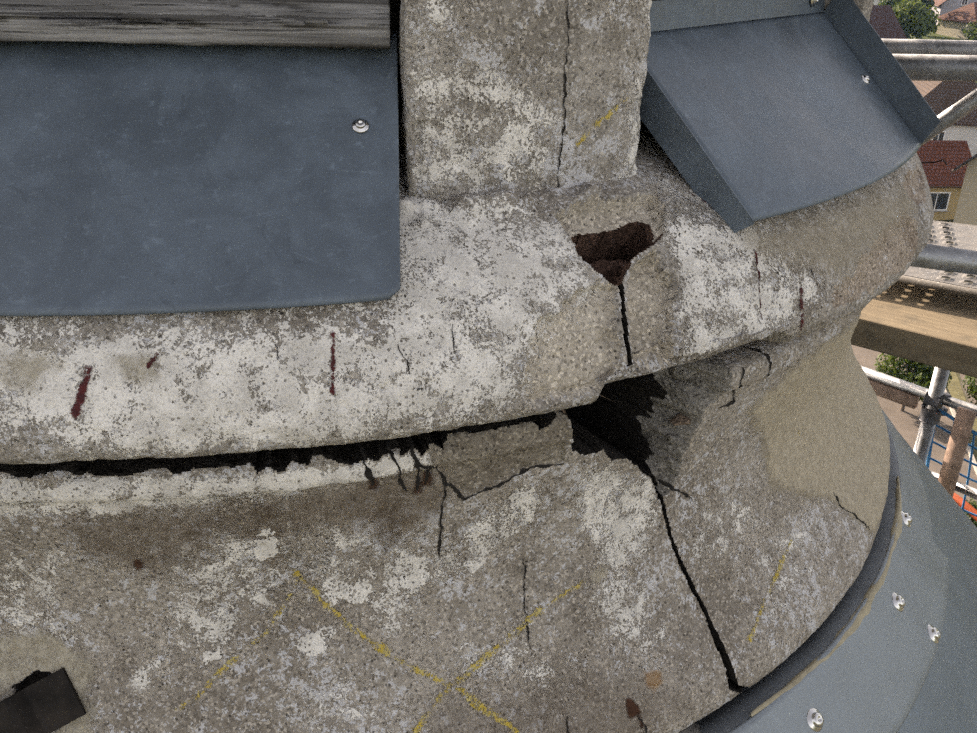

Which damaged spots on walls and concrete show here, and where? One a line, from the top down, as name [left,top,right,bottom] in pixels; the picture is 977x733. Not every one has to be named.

crack [557,0,570,187]
peeling [0,41,826,677]
crack [618,283,632,371]
crack [357,436,564,559]
peeling [124,659,163,694]
peeling [444,624,556,693]
crack [523,559,531,649]
crack [624,455,749,693]